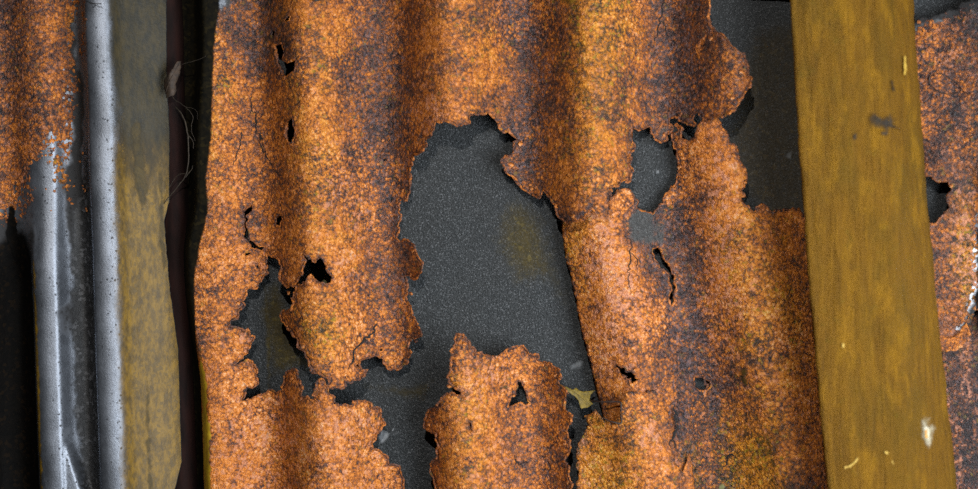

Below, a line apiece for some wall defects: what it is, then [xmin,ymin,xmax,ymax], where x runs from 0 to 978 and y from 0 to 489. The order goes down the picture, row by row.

rust [0,0,87,223]
rust [915,4,978,489]